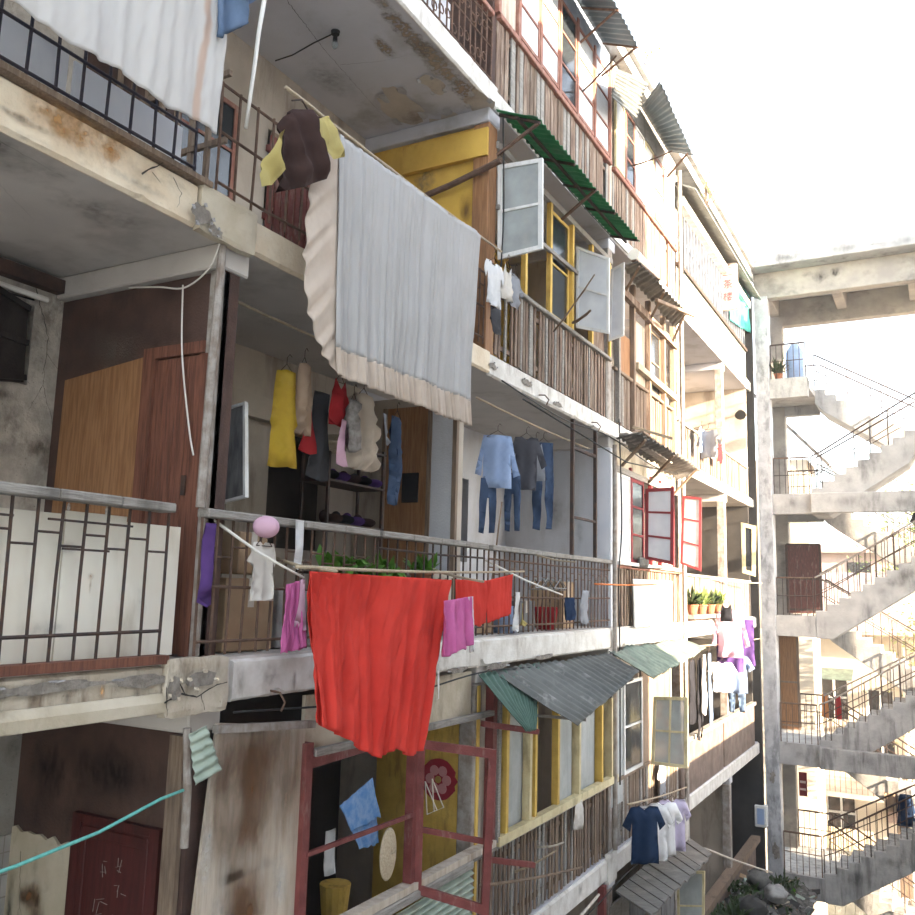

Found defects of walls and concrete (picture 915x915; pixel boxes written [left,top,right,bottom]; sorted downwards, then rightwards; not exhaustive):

peeling [377,1,495,126]
spalling [191,202,223,239]
spalling [0,669,219,702]